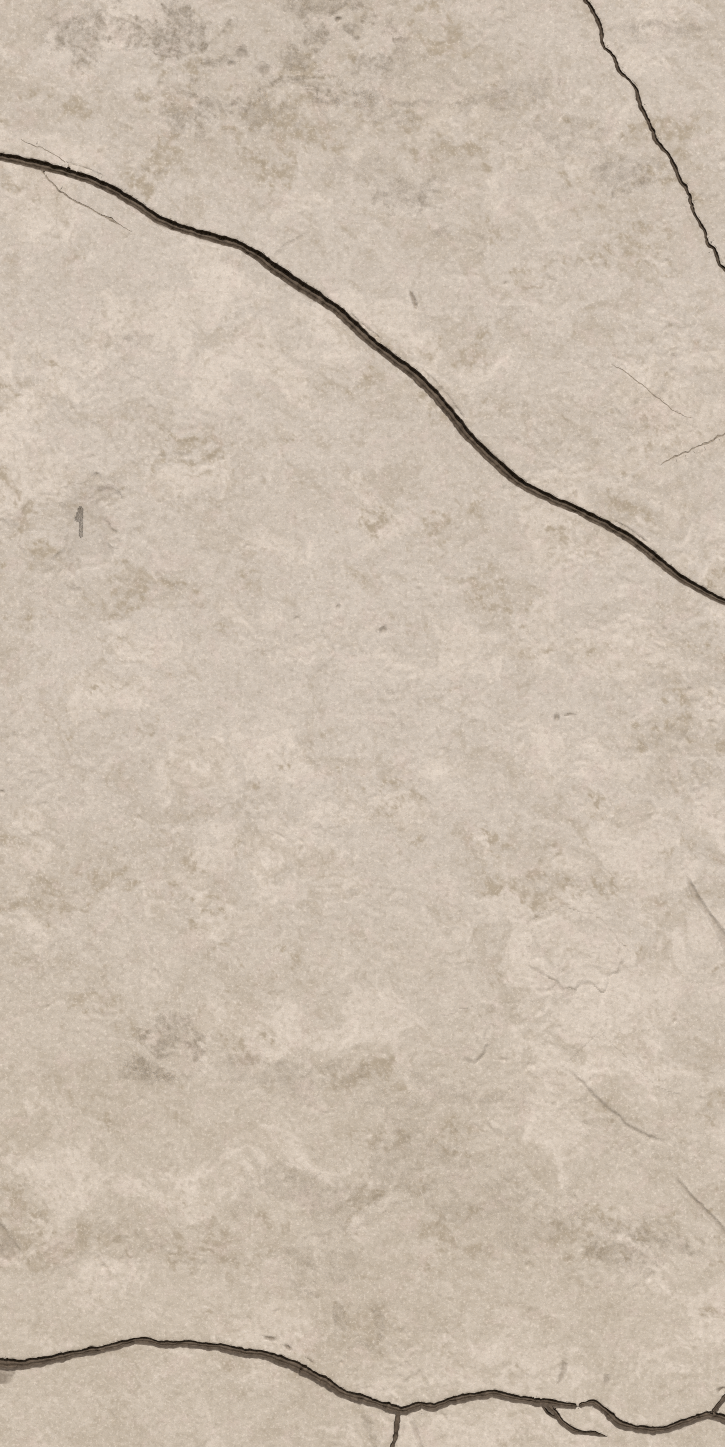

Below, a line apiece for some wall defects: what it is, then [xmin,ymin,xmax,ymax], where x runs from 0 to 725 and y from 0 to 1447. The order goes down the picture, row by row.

crack [583,0,725,272]
crack [0,140,725,605]
crack [0,1337,725,1447]